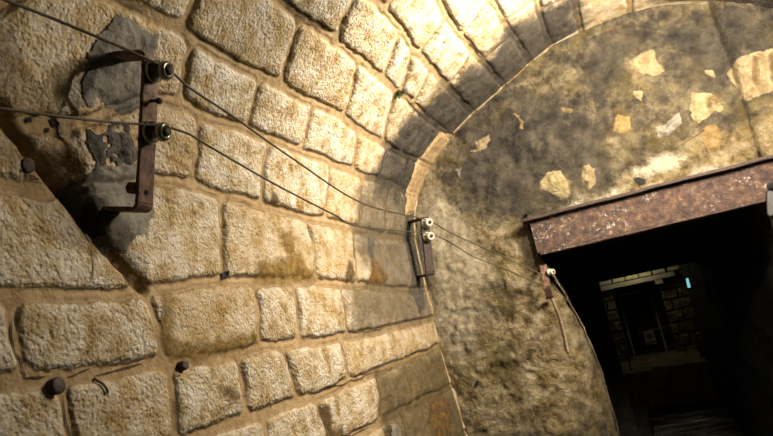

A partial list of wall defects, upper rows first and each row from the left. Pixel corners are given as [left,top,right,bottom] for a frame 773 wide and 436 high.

leakage [588,27,658,92]
spalling [628,49,665,76]
spalling [727,48,773,101]
spalling [612,114,631,134]
spalling [655,92,723,152]
flaking render [471,134,491,152]
spalling [539,170,571,201]
spalling [581,164,596,189]
leakage [633,153,686,178]
leakage [403,189,491,351]
leakage [375,348,466,436]